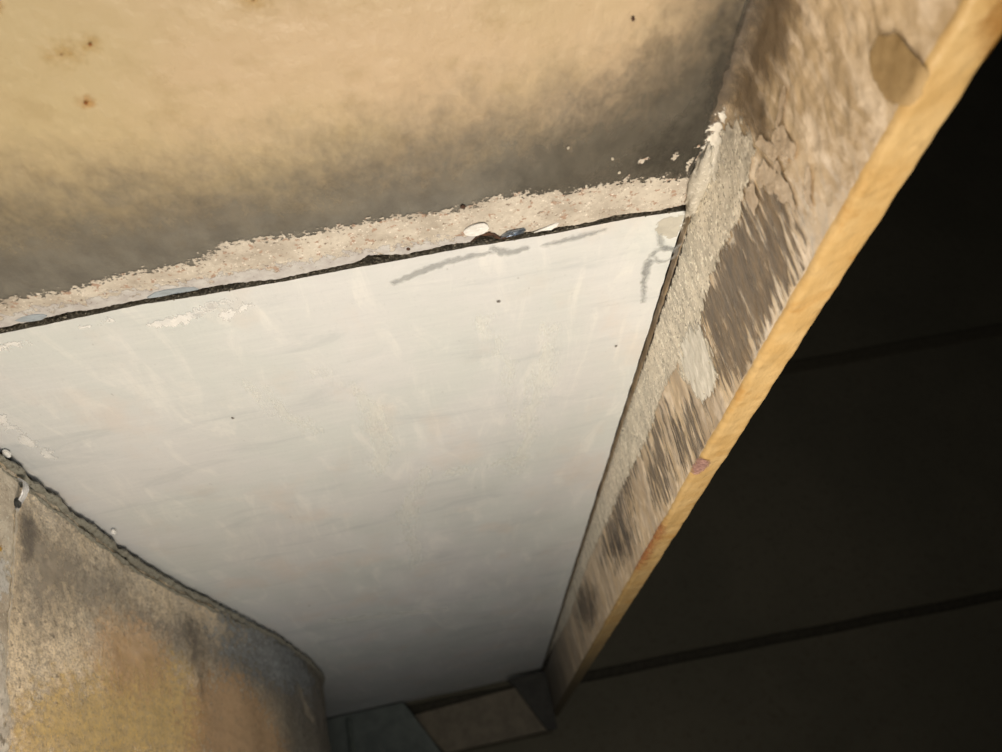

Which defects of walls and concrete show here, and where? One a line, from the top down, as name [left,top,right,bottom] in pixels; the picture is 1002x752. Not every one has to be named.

leakage [644,42,732,174]
peeling [546,109,757,659]